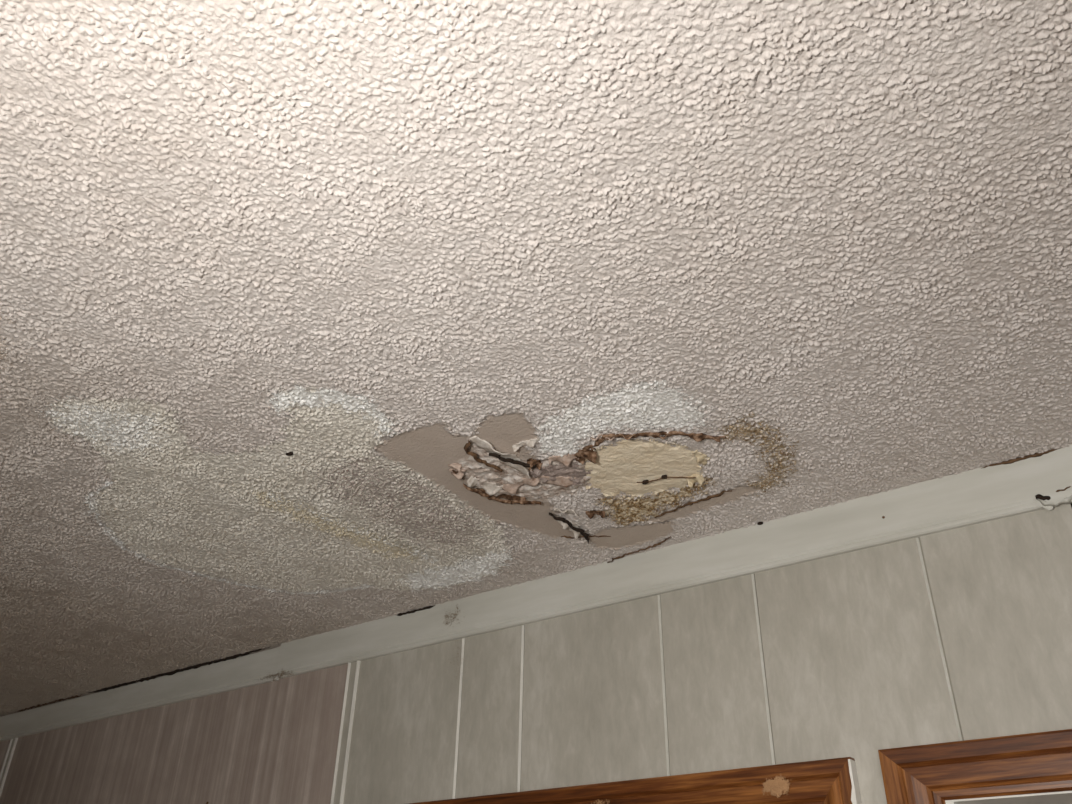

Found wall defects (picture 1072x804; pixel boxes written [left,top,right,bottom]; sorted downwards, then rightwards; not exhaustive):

leakage [35,378,519,595]
peeling [373,412,763,550]
crack [17,646,271,712]